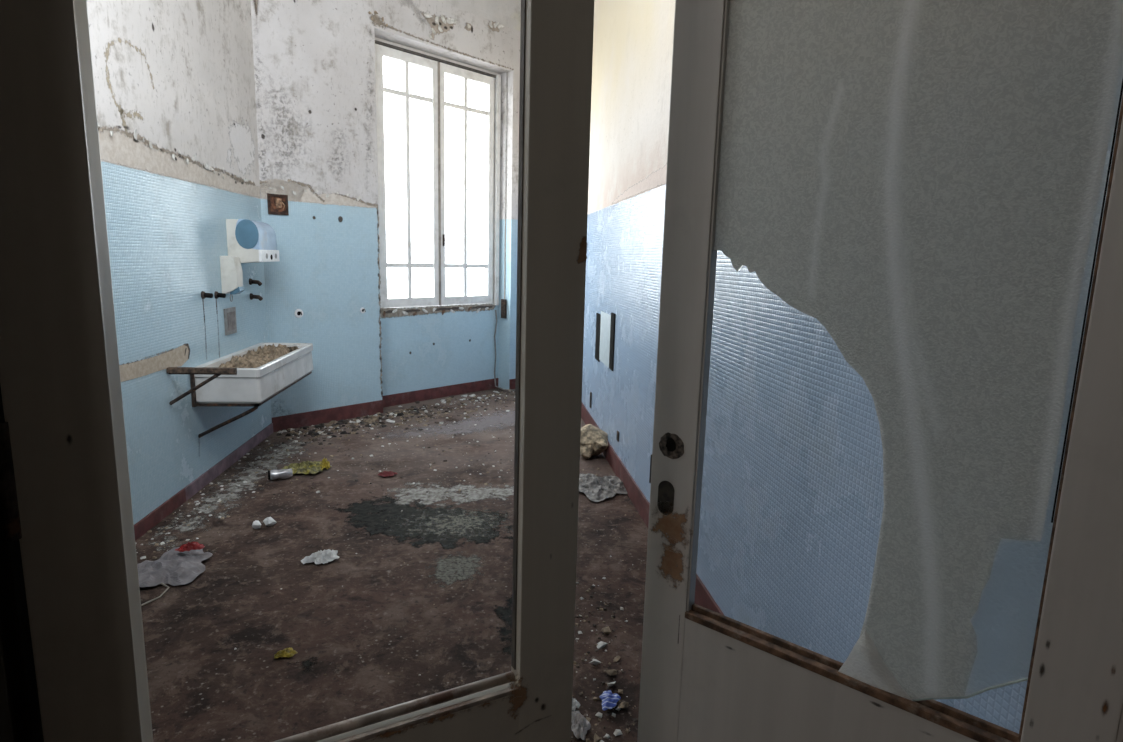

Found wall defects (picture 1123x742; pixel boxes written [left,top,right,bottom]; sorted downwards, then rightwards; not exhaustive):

peeling [651,510,691,588]